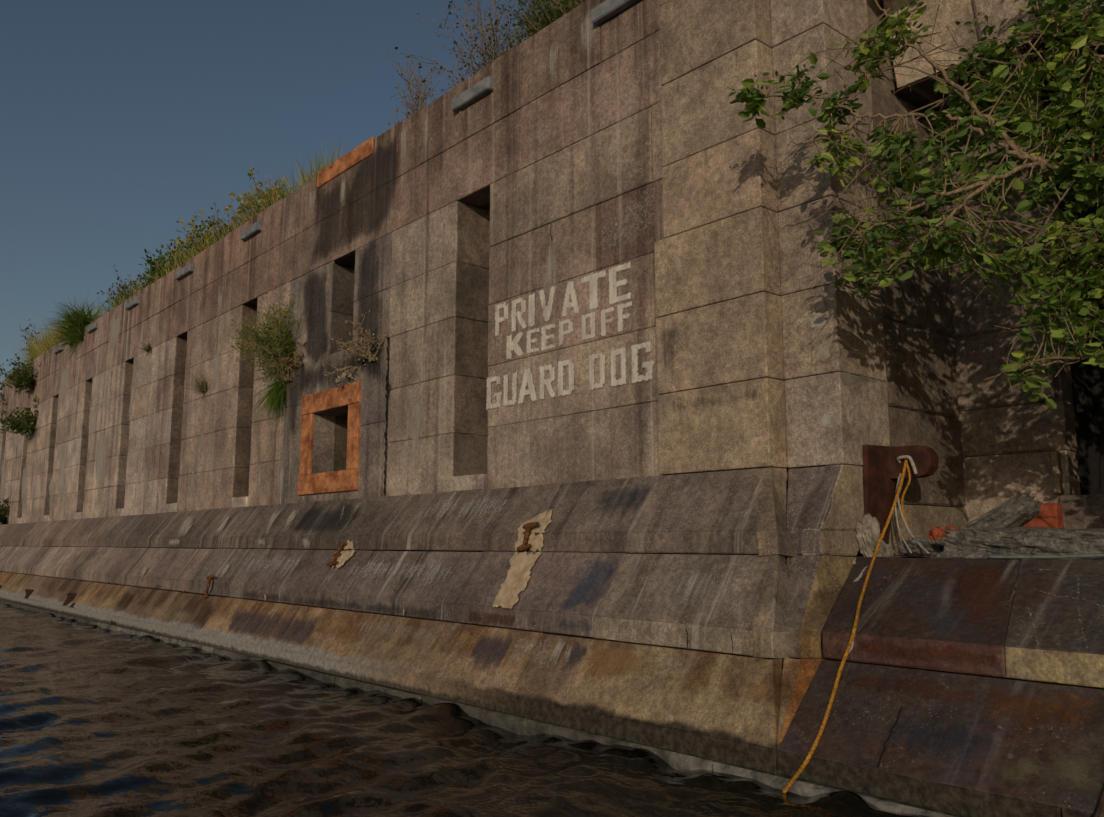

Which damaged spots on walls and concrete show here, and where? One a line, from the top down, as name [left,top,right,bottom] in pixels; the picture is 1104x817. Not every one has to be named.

damp [347,244,379,373]
spalling [331,540,355,568]
spalling [493,509,553,609]